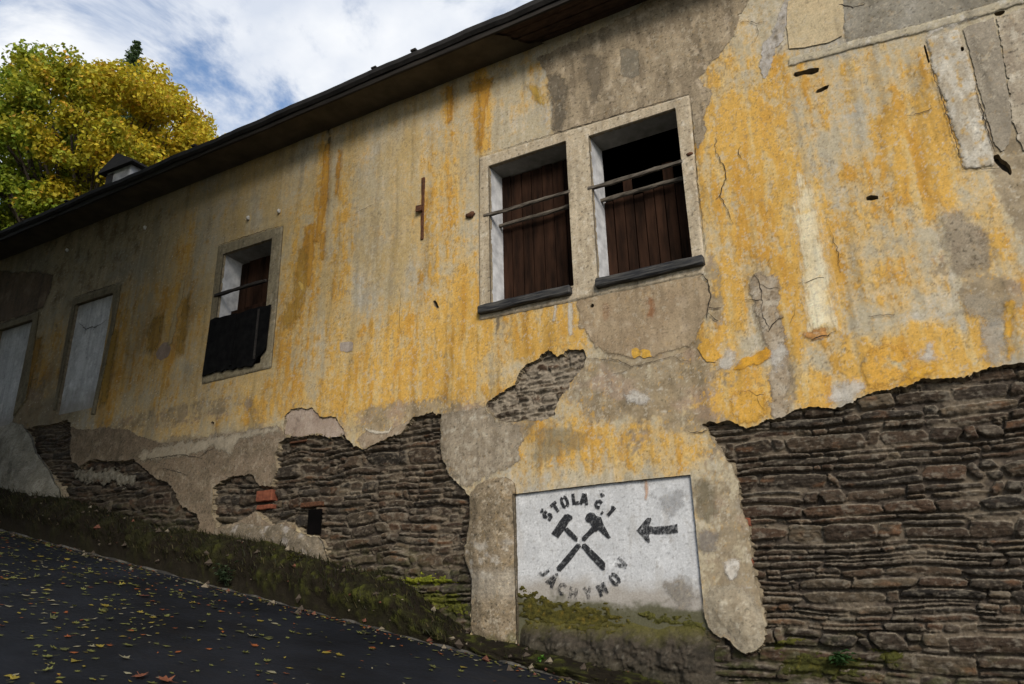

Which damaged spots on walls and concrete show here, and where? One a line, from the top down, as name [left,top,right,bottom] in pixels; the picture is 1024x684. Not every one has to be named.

peeling [843,0,1024,150]
crack [487,94,742,246]
hole [993,154,1012,175]
crack [703,231,840,332]
flaking render [486,349,587,423]
flaking render [27,407,472,632]
flaking render [702,273,1024,684]